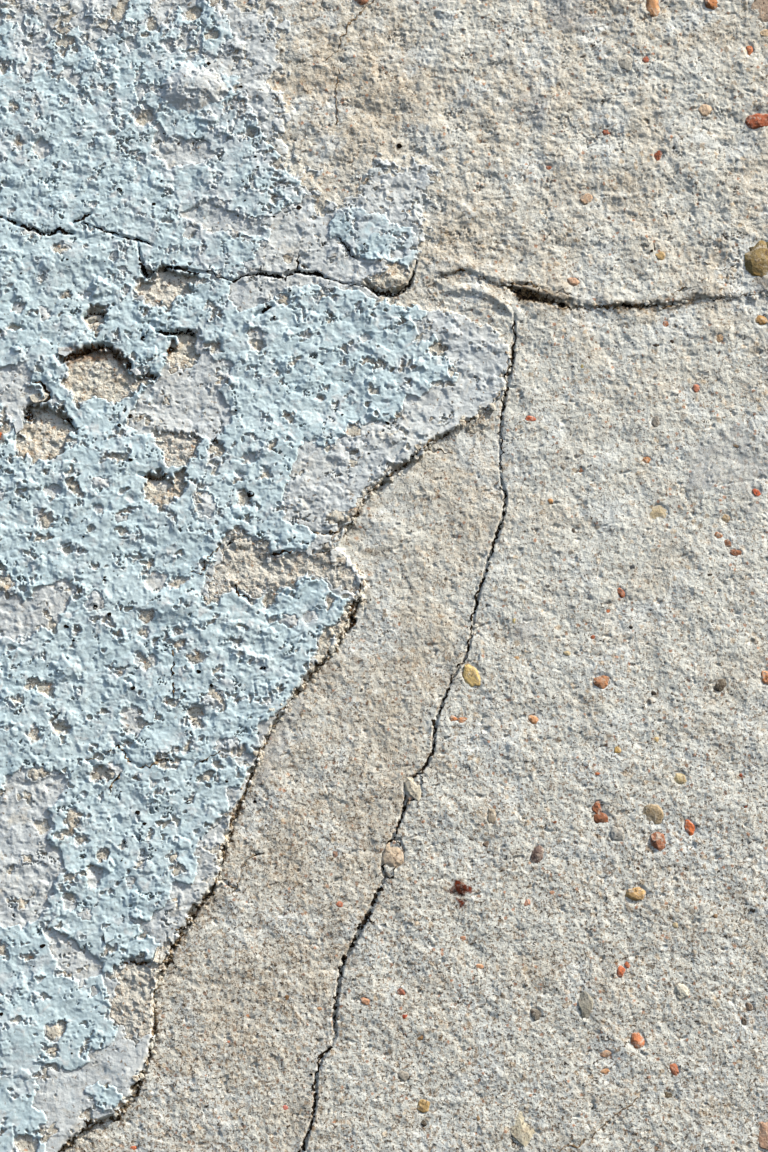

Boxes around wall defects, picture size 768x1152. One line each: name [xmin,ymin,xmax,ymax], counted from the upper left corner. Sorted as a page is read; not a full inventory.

peeling [149,118,223,169]
spalling [134,265,199,312]
crack [0,214,418,297]
crack [157,328,195,337]
peeling [0,305,237,511]
peeling [178,156,511,671]
crack [189,543,221,575]
peeling [0,579,81,643]
crack [298,262,768,1152]
crack [58,580,366,1152]
peeling [0,767,171,1152]